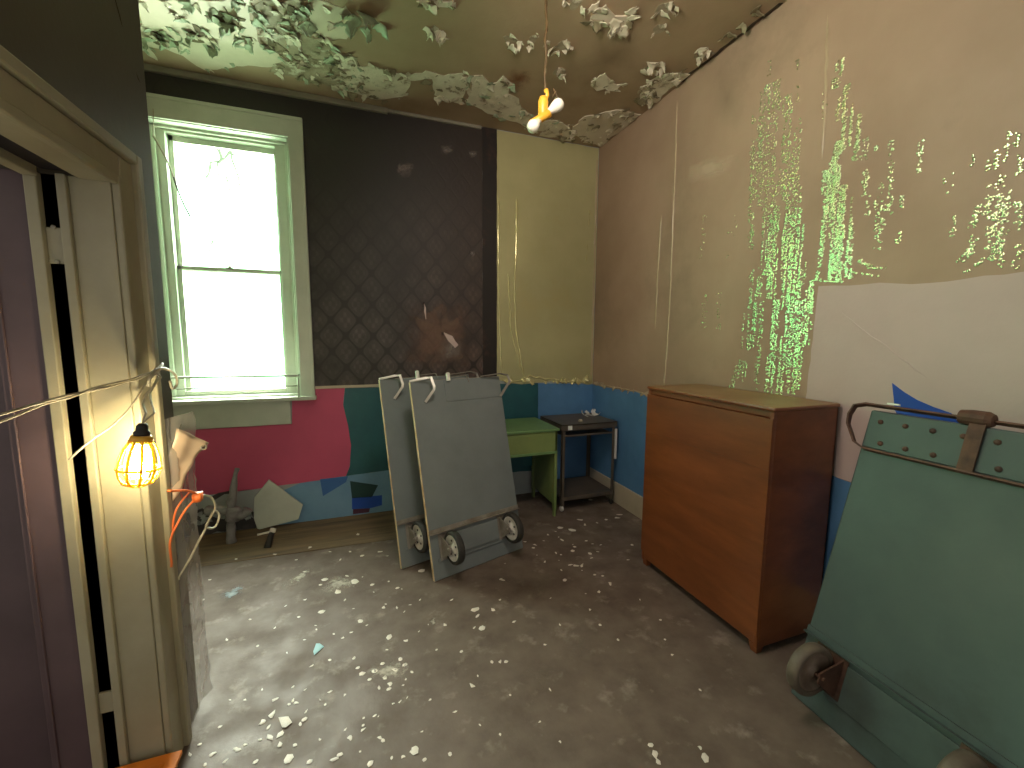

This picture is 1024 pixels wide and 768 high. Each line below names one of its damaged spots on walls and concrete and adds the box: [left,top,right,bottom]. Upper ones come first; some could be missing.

peeling [138,0,714,147]
peeling [502,375,649,397]
flaking render [806,272,1024,482]